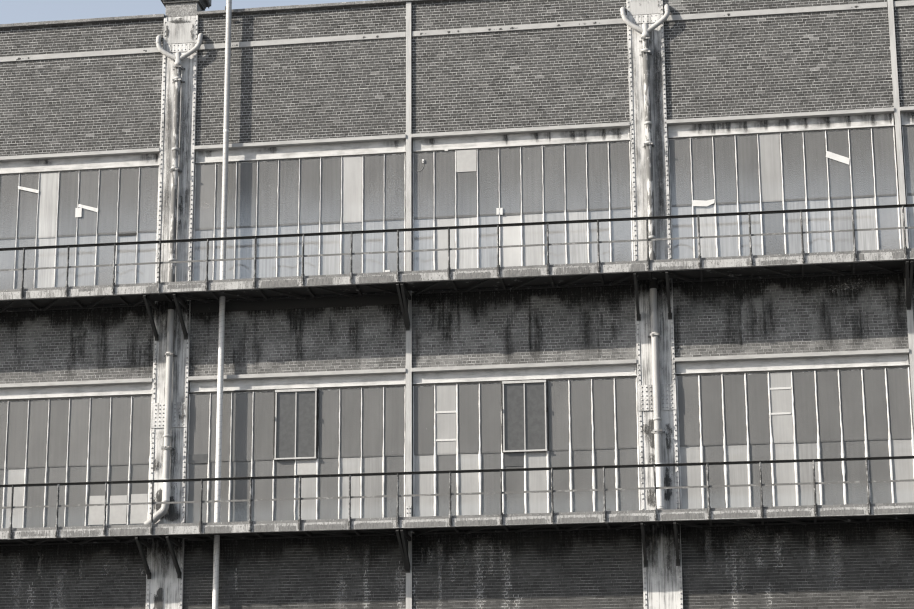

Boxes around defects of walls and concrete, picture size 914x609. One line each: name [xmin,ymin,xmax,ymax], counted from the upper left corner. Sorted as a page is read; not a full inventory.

peeling [166,18,196,41]
leakage [895,287,905,334]
leakage [473,536,523,609]
leakage [725,543,744,608]